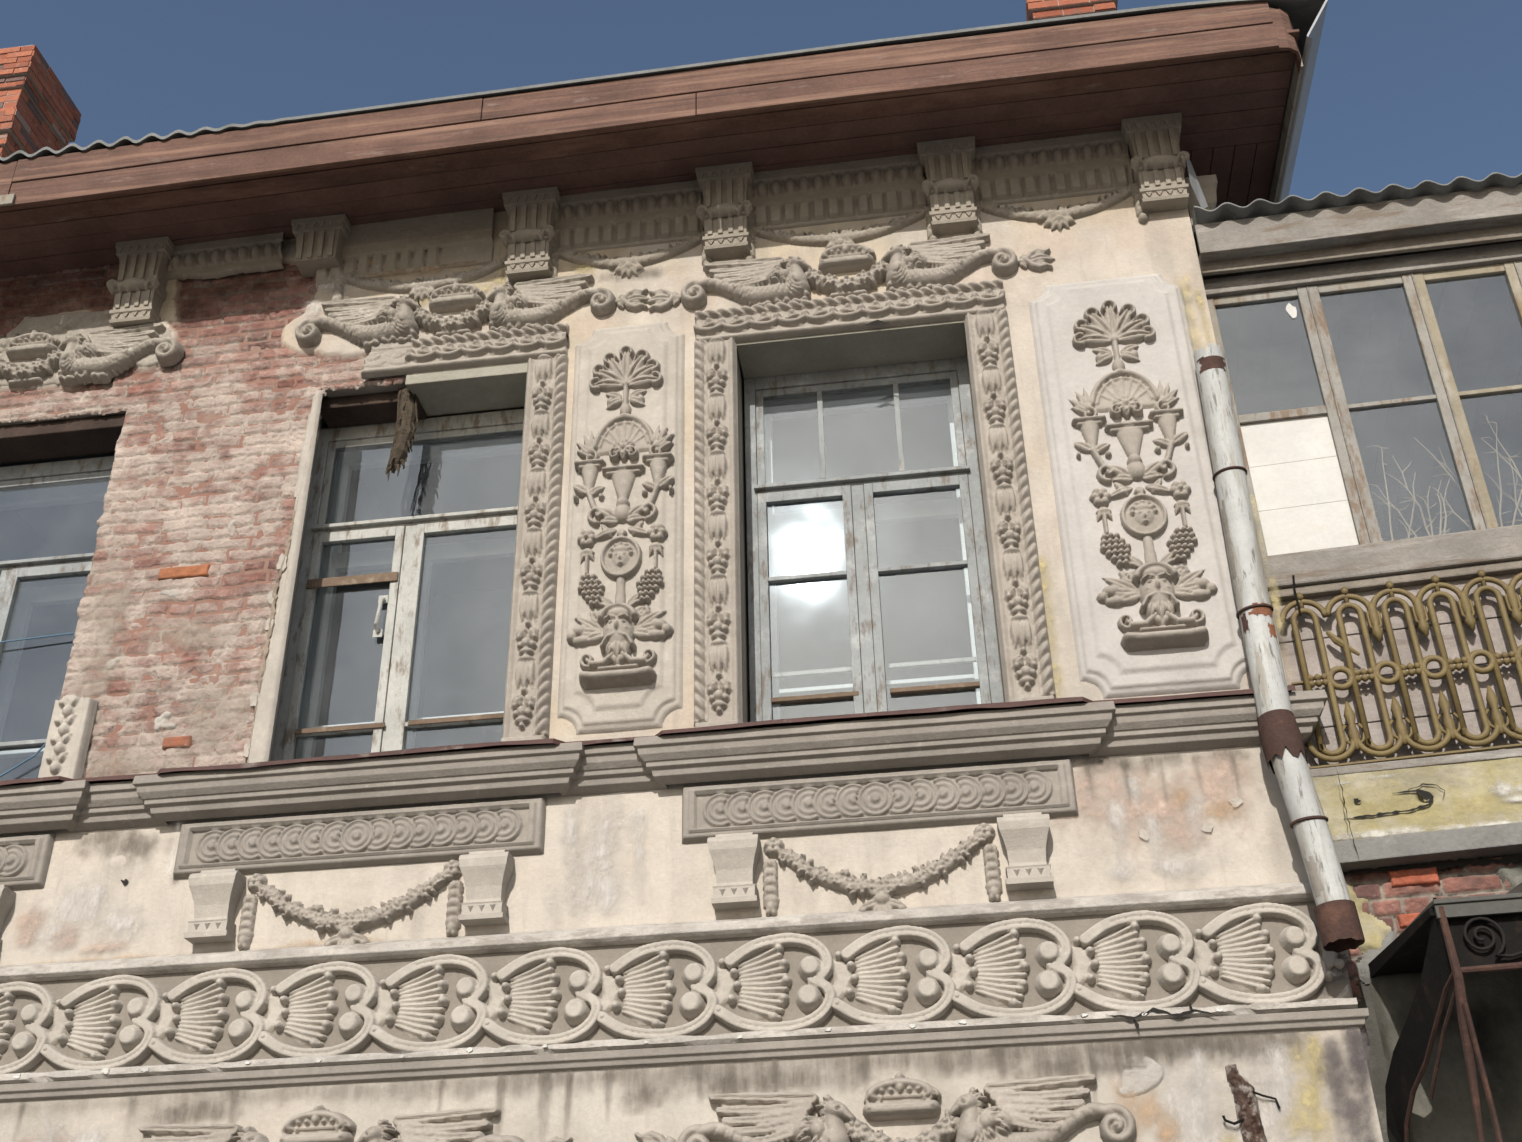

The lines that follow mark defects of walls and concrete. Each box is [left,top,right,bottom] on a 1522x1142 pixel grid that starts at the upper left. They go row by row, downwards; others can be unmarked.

flaking render [0,263,407,777]
crack [1336,769,1522,874]
flaking render [1343,857,1522,938]
flaking render [1345,948,1364,1002]